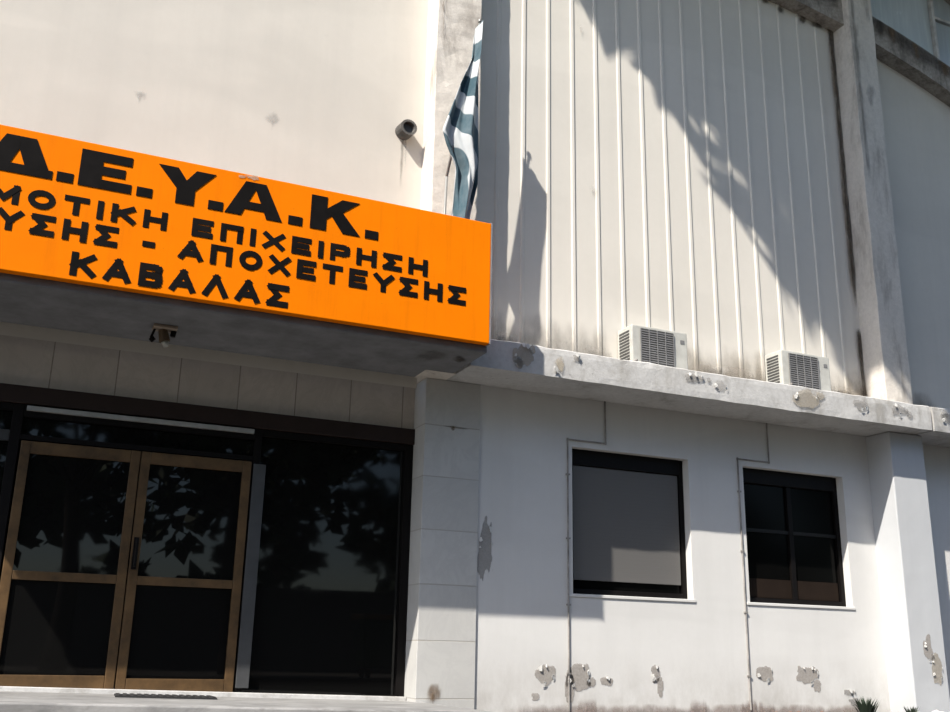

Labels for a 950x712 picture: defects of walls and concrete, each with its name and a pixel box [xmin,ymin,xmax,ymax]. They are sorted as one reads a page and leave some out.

spalling [513,343,536,368]
spalling [793,389,824,408]
peeling [477,516,493,580]
peeling [532,664,613,703]
peeling [651,665,663,697]
peeling [756,666,773,683]
peeling [796,666,821,692]
peeling [923,634,943,685]